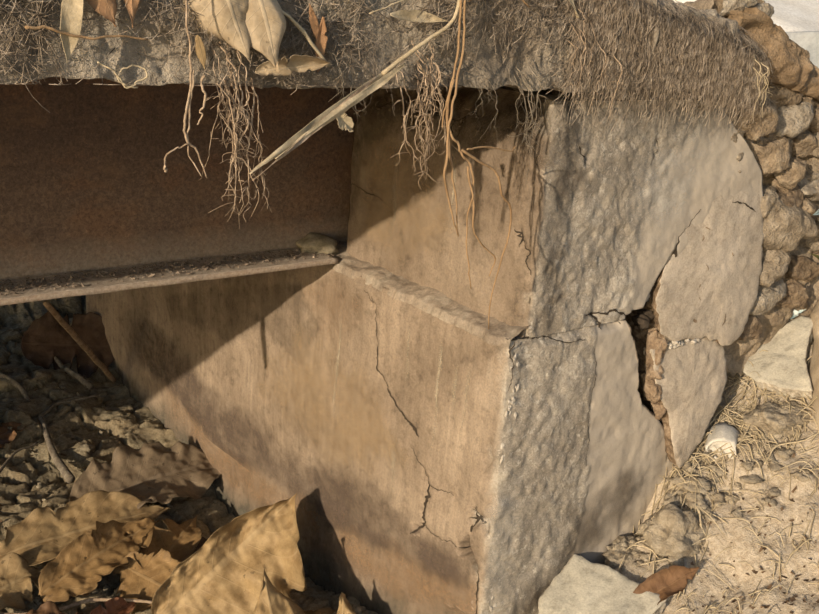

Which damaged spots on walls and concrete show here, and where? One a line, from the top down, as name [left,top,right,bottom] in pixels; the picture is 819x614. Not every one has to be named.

crack [514,229,531,275]
crack [645,209,701,304]
crack [586,309,626,329]
leakage [143,329,386,547]
crack [366,292,469,548]
crack [507,336,597,466]
peeling [643,337,727,469]
leakage [301,555,348,598]
leakage [411,539,458,580]